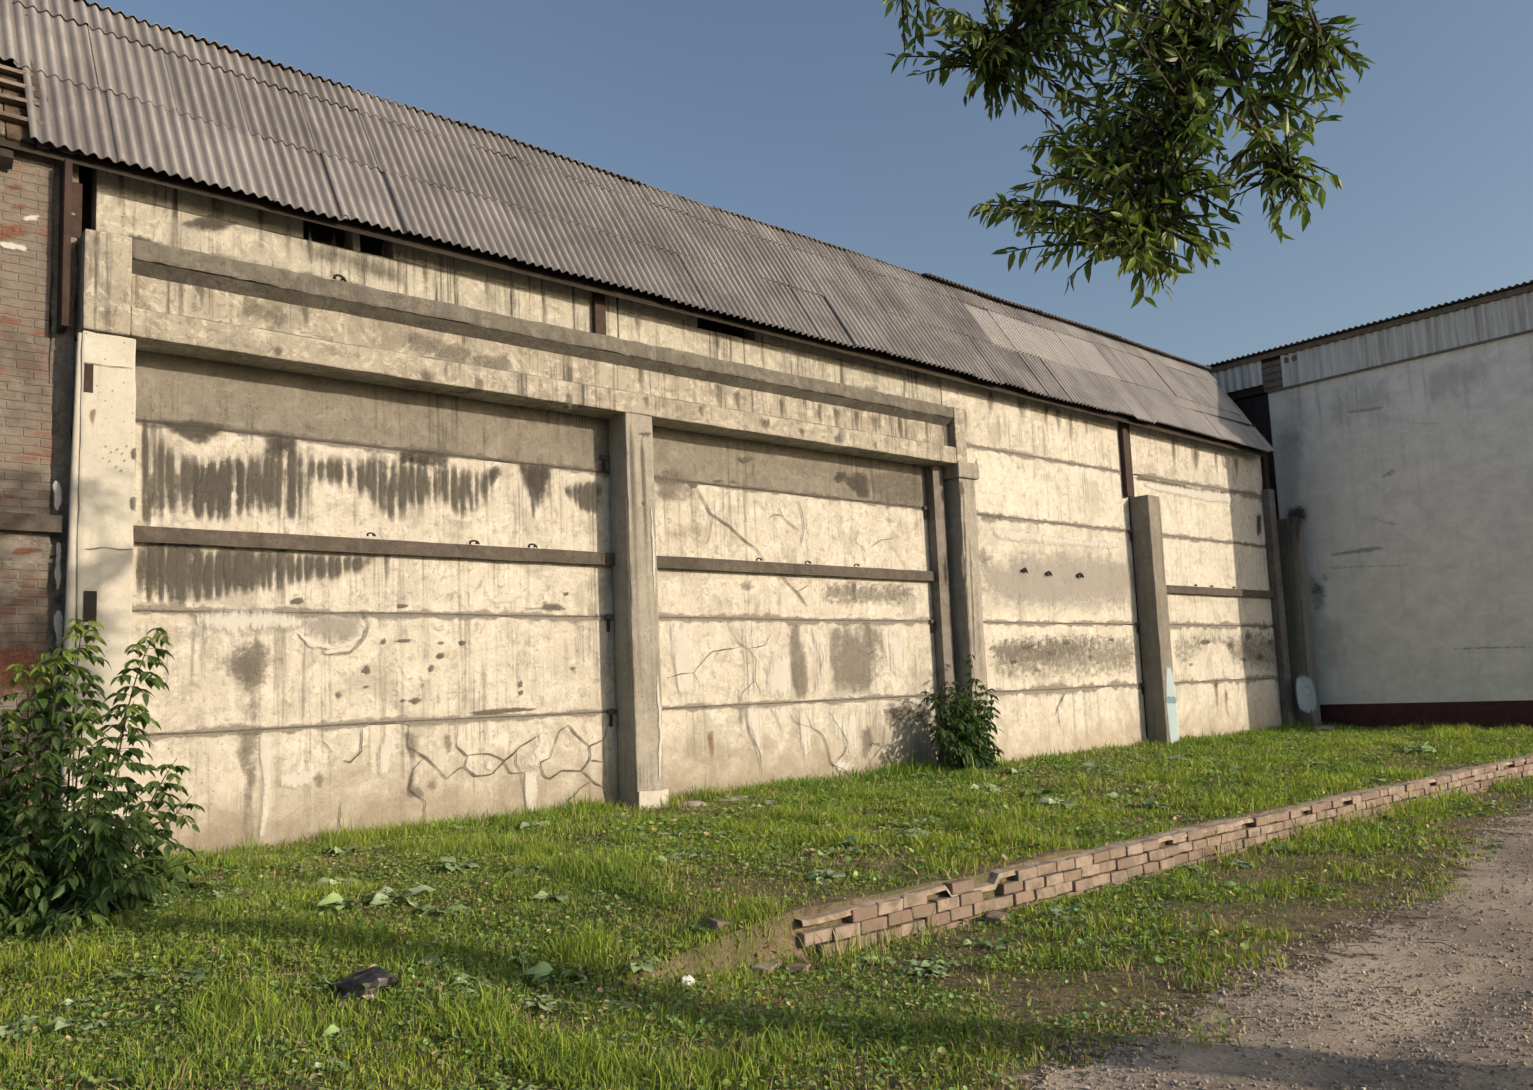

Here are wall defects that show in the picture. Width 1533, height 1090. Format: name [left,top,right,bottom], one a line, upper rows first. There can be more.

leakage [143,419,152,525]
leakage [195,457,242,520]
crack [697,488,808,604]
crack [323,729,363,763]
crack [407,723,609,819]
leakage [672,623,696,694]
crack [668,630,899,773]
leakage [748,624,907,758]
leakage [830,701,928,771]